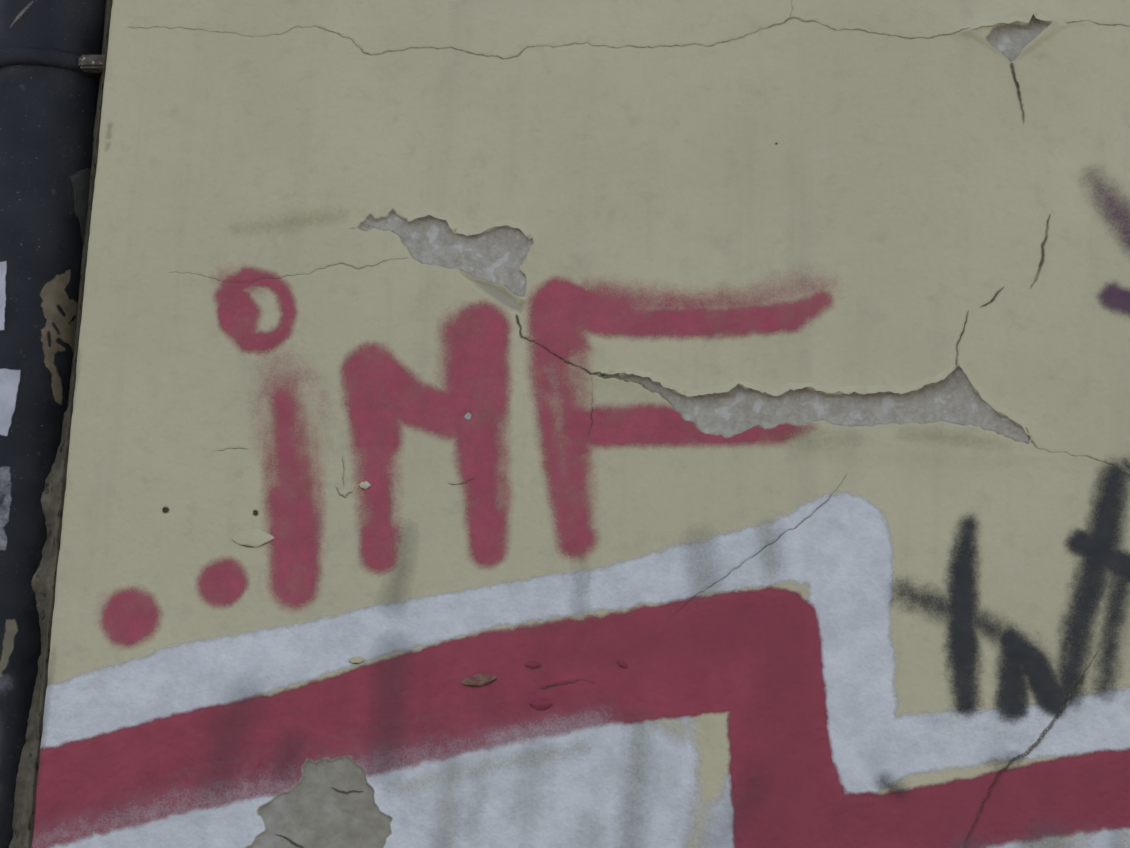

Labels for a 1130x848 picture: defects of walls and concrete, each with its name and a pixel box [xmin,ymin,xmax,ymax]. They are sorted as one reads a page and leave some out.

spalling [962,9,1053,62]
spalling [359,210,533,296]
crack [1039,215,1050,270]
peeling [40,270,78,404]
crack [516,314,605,435]
spalling [599,362,1033,444]
crack [956,289,1002,366]
peeling [0,619,18,677]
crack [972,652,1098,827]
spalling [247,757,392,848]